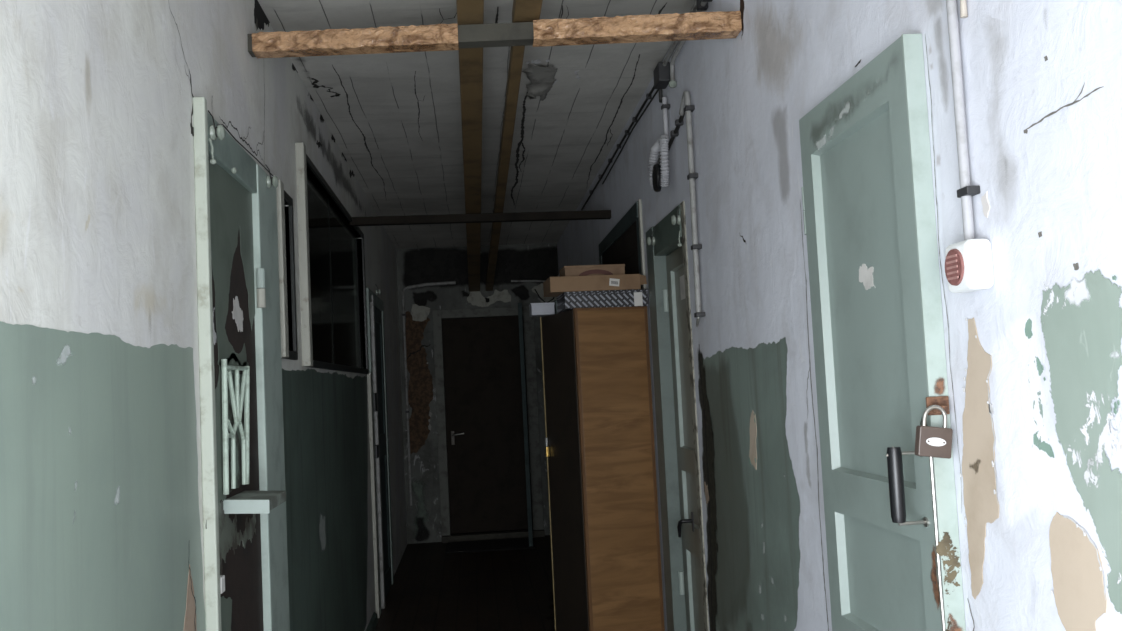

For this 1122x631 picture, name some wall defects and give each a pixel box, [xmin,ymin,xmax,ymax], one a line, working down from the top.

crack [169,7,265,163]
crack [332,65,386,197]
crack [511,92,528,205]
crack [1025,83,1104,130]
spalling [403,304,433,455]
peeling [749,410,757,470]
corrosion [935,378,945,395]
peeling [936,318,999,631]
peeling [1025,263,1122,631]
peeling [183,565,197,631]
corrosion [931,548,940,606]